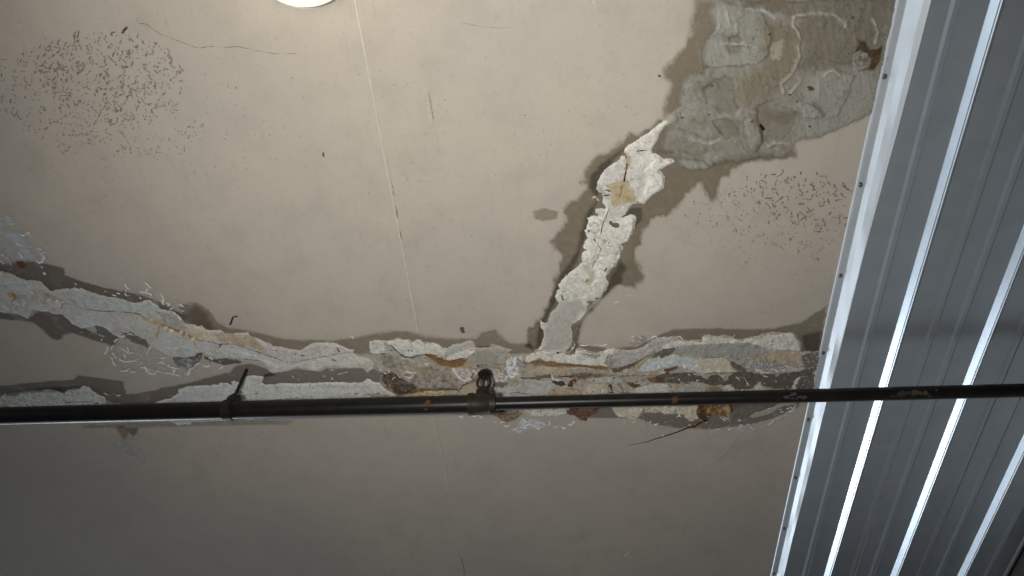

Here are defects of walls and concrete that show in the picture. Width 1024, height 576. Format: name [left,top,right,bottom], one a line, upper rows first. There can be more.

crack [129,6,297,54]
damp [0,2,825,407]
rust [427,354,466,367]
rust [531,359,607,379]
rust [566,408,599,421]
damp [459,403,799,433]
peeling [750,403,797,418]